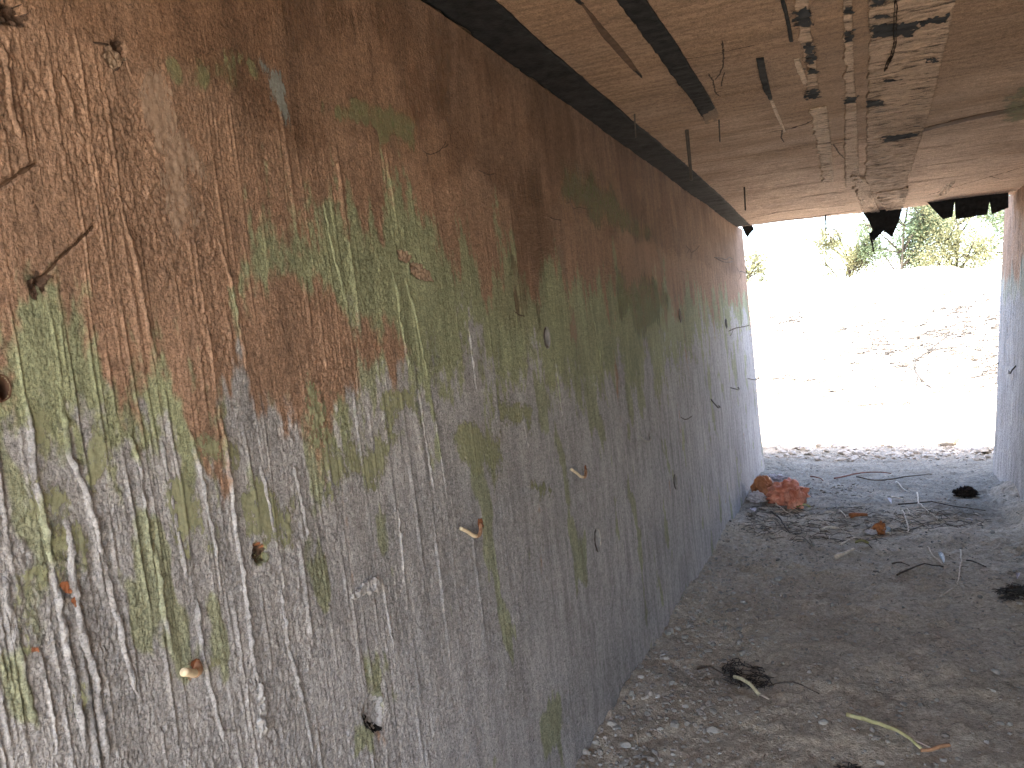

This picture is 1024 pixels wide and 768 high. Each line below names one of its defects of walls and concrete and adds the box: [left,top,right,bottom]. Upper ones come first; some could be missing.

water stain [139,56,211,240]